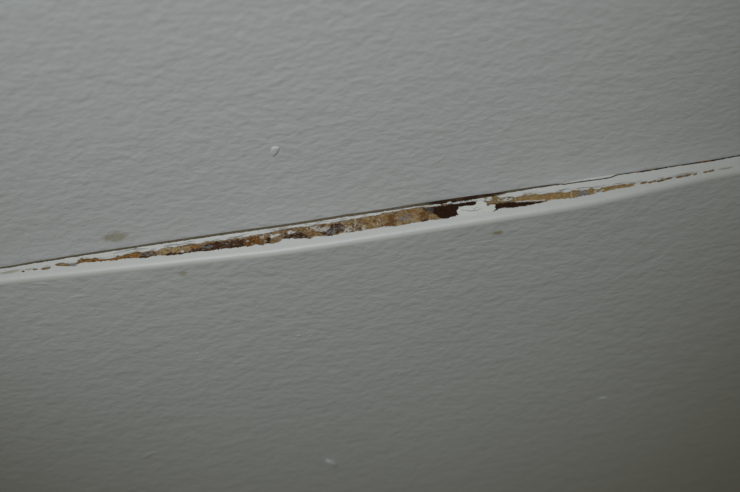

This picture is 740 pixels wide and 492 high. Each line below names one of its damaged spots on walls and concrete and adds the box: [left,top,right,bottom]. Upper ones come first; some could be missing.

crack [0,155,740,269]
peeling [34,170,714,270]